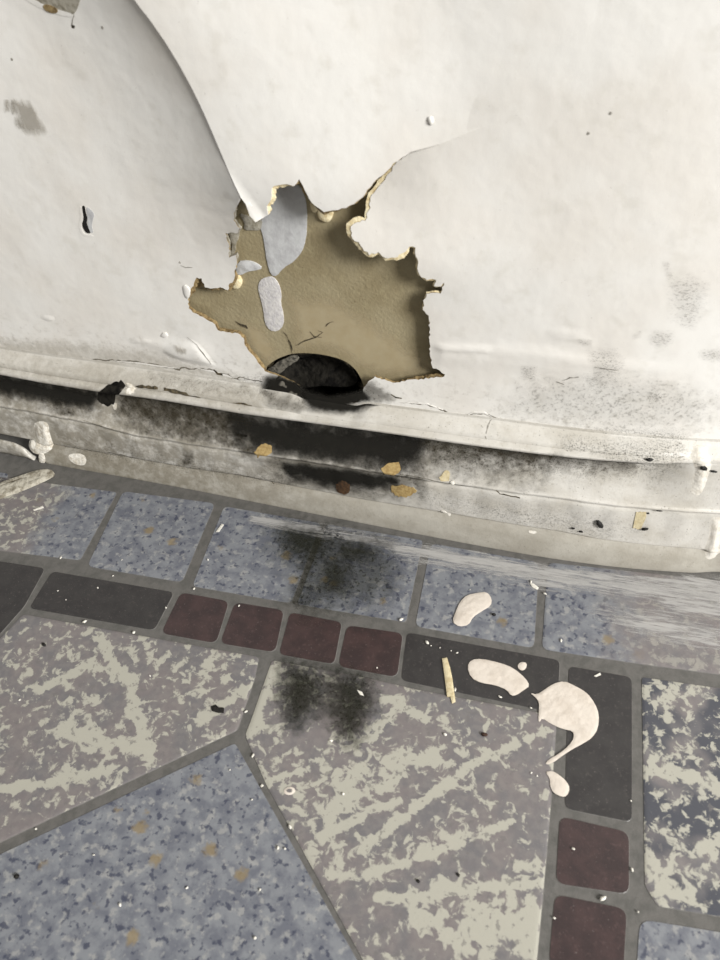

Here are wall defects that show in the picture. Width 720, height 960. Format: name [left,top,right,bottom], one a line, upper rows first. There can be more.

peeling [79,206,94,237]
peeling [135,0,598,396]
leakage [0,375,97,414]
leakage [121,376,679,491]
leakage [249,516,720,650]
leakage [281,668,370,738]